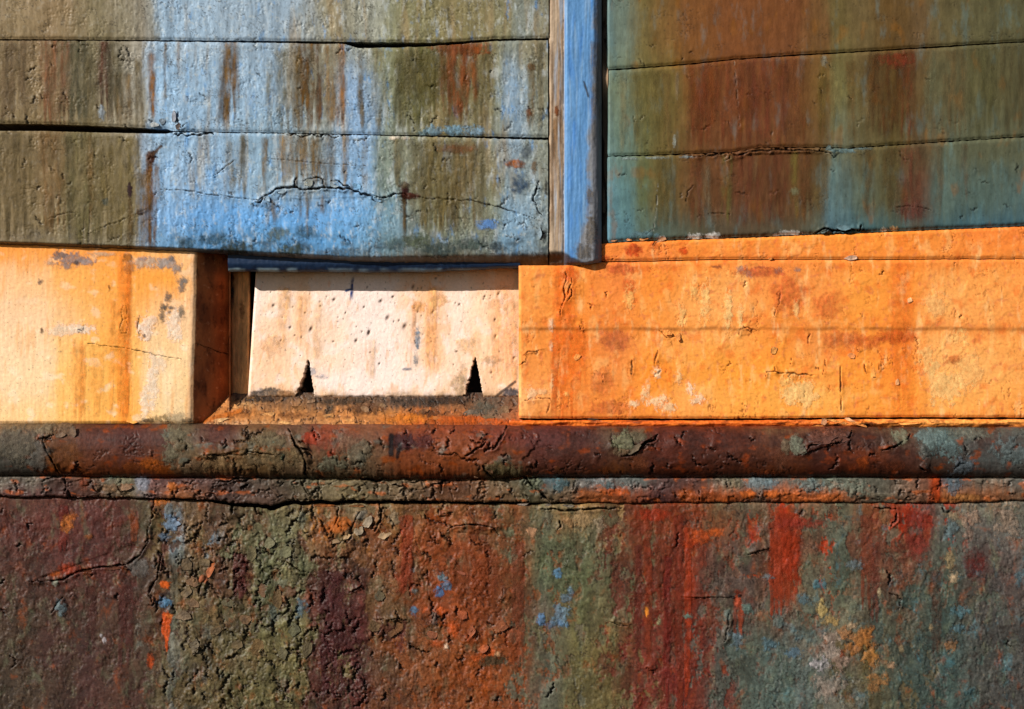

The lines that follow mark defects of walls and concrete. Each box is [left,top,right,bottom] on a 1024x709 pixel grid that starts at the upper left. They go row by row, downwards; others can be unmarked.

crack [161,161,398,203]
leakage [386,142,506,257]
crack [694,149,832,161]
leakage [180,235,253,255]
leakage [274,229,311,256]
corrosion [384,414,432,458]
peeling [891,420,1024,496]
crack [29,501,161,613]
peeling [96,475,181,541]
peeling [296,504,403,544]
corrosion [769,512,820,618]
corrosion [634,509,722,707]